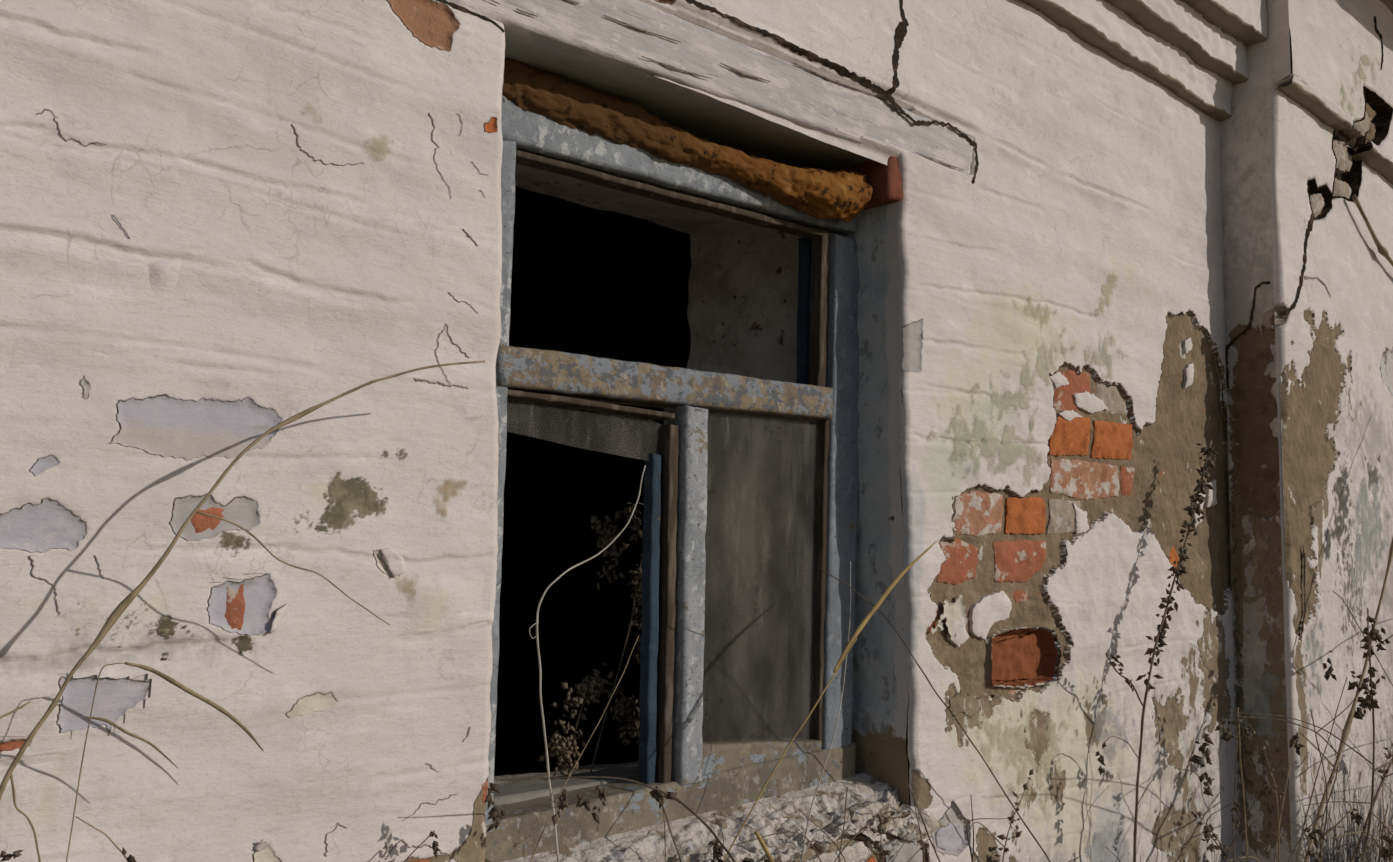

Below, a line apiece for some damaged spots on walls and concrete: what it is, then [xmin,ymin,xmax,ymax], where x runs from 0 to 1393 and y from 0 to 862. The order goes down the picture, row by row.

spalling [387,0,460,51]
crack [1374,16,1384,70]
crack [438,0,979,183]
crack [37,109,106,146]
crack [292,124,365,166]
crack [1216,213,1331,418]
peeling [110,394,282,460]
mould [295,472,388,534]
spalling [926,305,1353,806]
peeling [208,574,288,636]
peeling [57,676,150,736]
spalling [764,769,1018,862]